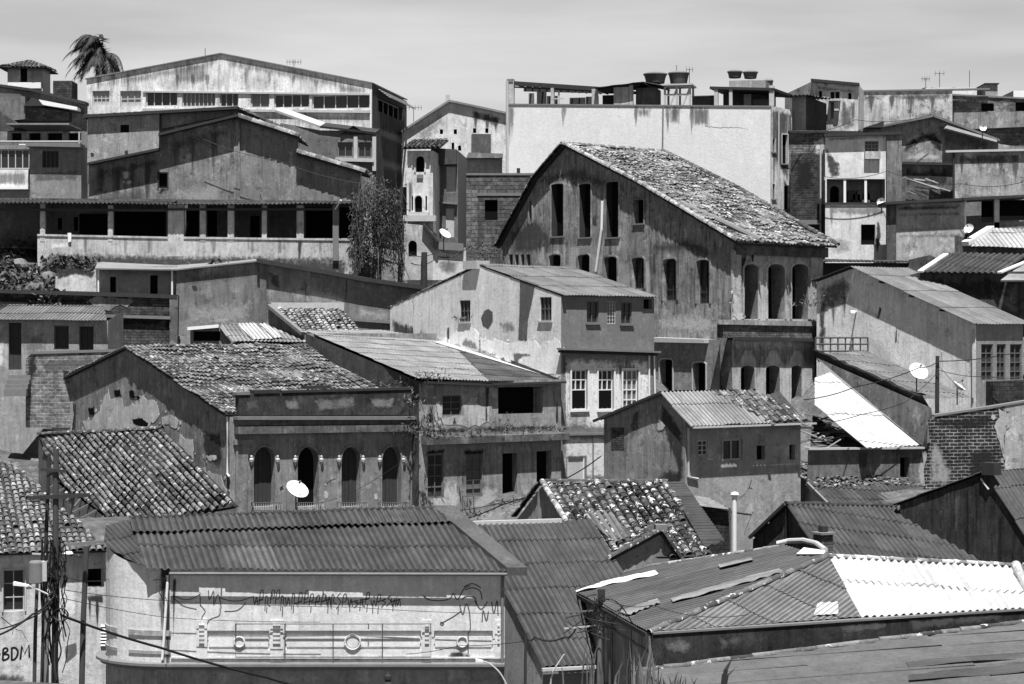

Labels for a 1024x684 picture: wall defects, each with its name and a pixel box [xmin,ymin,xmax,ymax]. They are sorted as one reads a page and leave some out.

leakage [666,107,707,127]
flaking render [437,327,564,377]
flaking render [51,390,230,494]